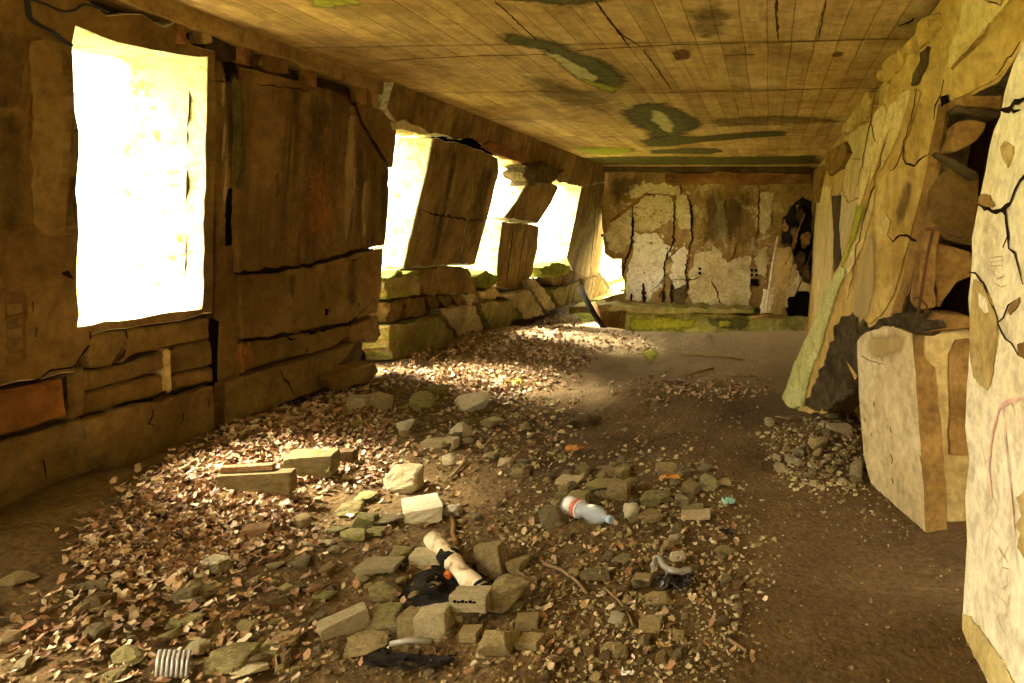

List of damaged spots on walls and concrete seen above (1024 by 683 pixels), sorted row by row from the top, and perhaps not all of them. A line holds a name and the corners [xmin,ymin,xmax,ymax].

crack [387,0,914,93]
crack [996,41,1020,76]
crack [766,0,1003,299]
crack [1000,97,1024,114]
crack [239,242,380,274]
crack [420,210,476,223]
peeling [596,181,775,306]
crack [622,184,760,305]
crack [969,175,1024,356]
water stain [707,317,748,329]